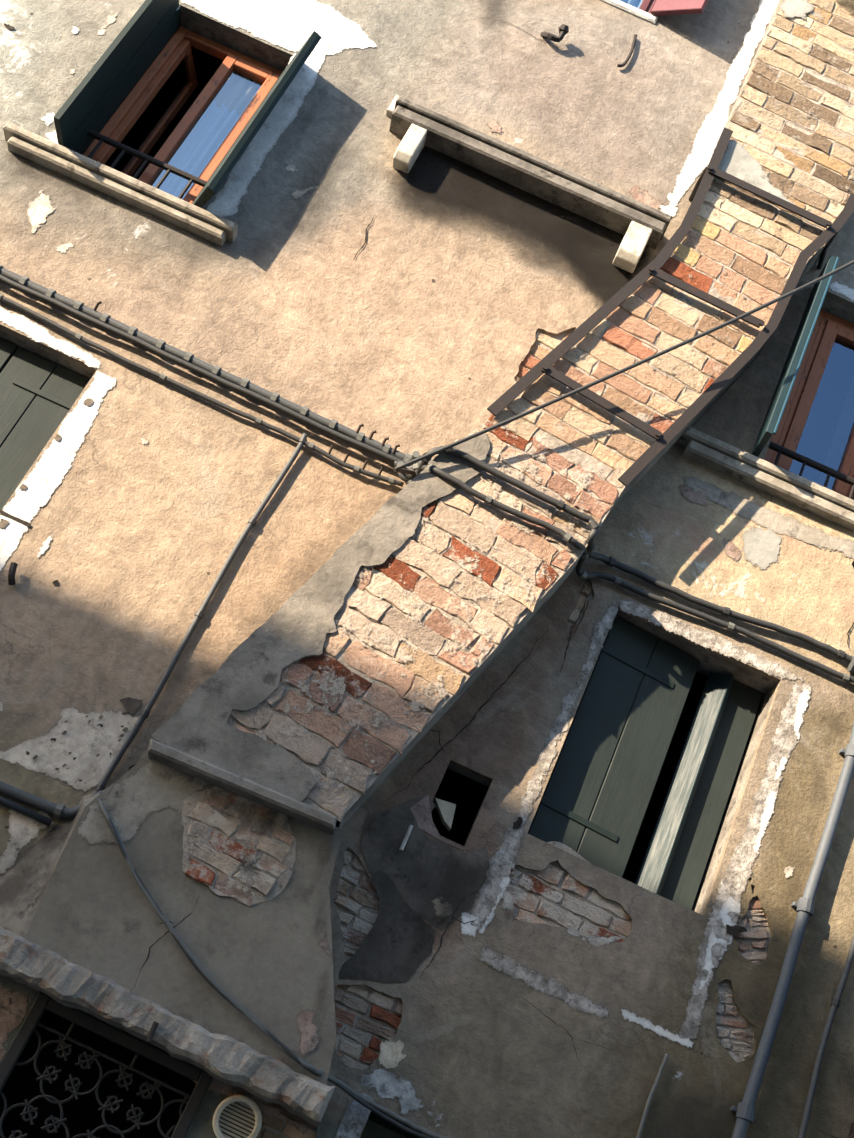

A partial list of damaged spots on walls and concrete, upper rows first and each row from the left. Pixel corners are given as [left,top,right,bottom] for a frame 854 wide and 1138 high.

leakage [836,0,854,14]
flaking render [227,0,854,819]
flaking render [0,706,140,792]
flaking render [182,786,296,907]
spalling [410,795,464,851]
peeling [431,599,812,1063]
crack [135,897,199,985]
flaking render [333,847,379,957]
flaking render [0,982,28,1062]
flaking render [293,1010,320,1055]
flaking render [334,985,407,1070]